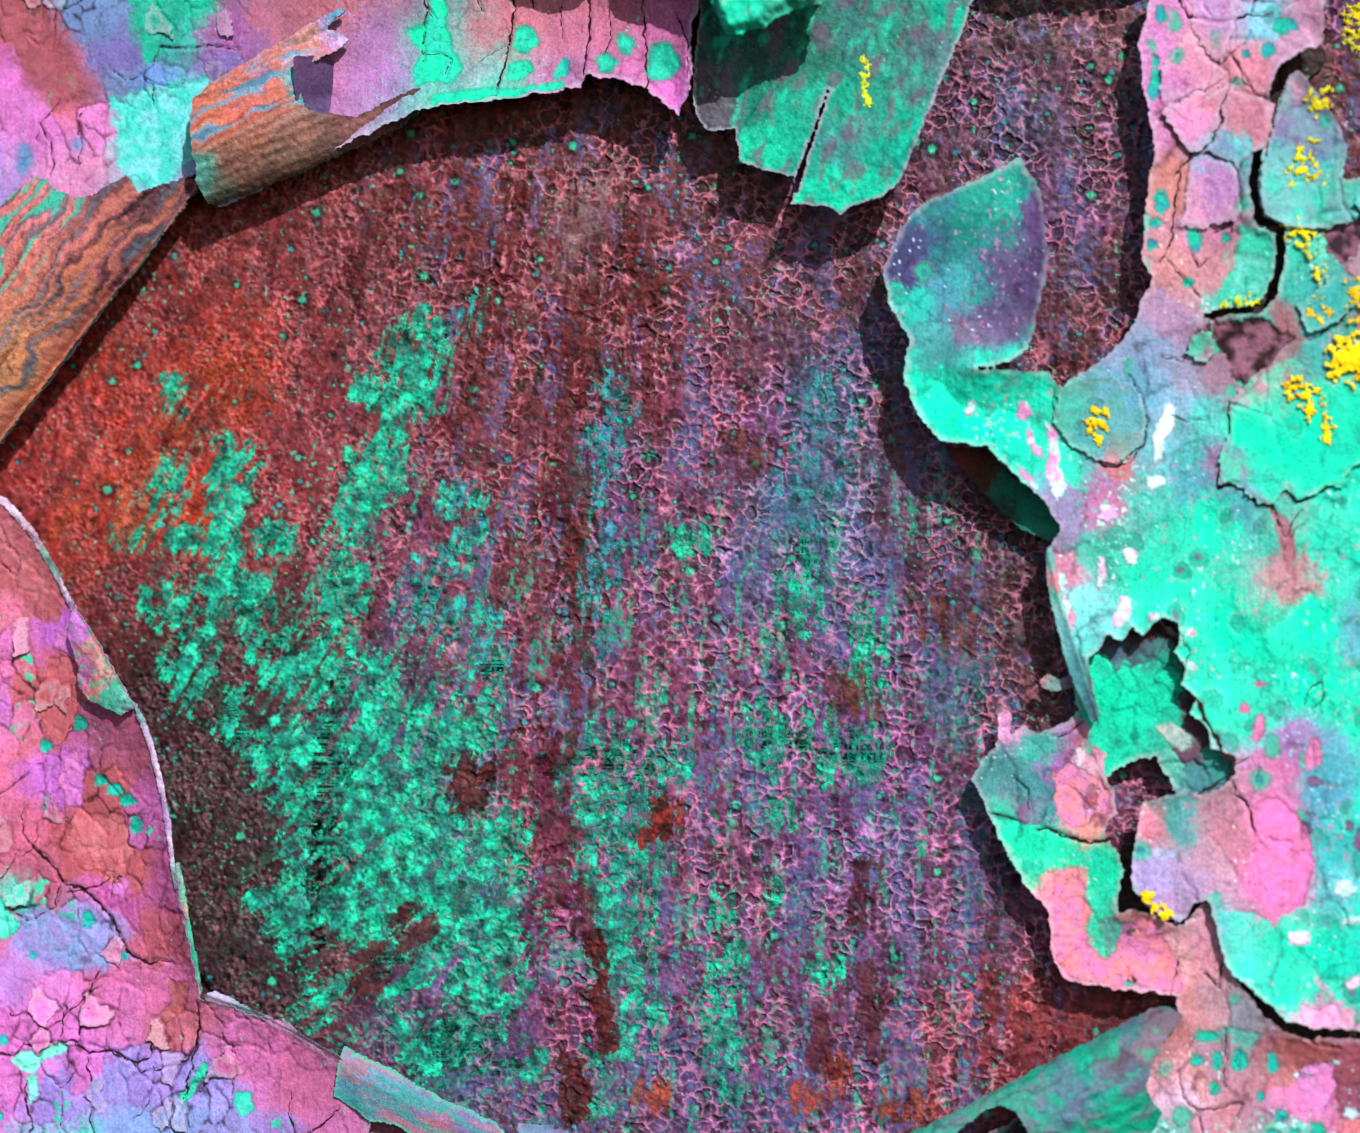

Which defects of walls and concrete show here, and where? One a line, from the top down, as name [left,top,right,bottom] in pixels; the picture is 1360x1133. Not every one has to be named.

crack [421,0,689,95]
peeling [1147,0,1360,333]
crack [1159,0,1360,320]
peeling [1045,377,1149,502]
peeling [1184,317,1360,578]
crack [1216,464,1345,549]
corrosion [513,203,672,1127]
peeling [1053,747,1176,849]
crack [0,753,201,1133]
corrosion [347,898,442,1008]
corrosion [790,958,891,1116]
corrosion [964,964,1177,1109]